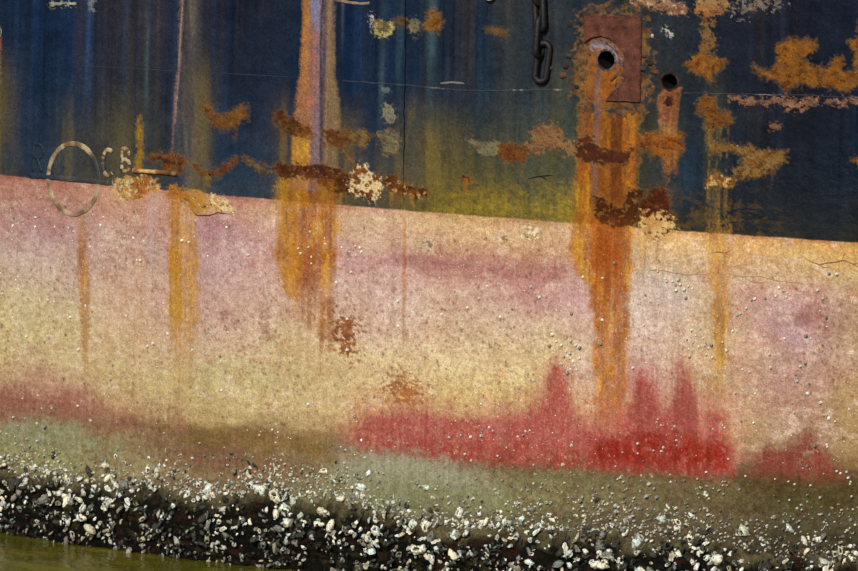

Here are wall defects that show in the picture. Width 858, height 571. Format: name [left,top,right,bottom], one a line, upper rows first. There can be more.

peeling [108,173,238,219]
corrosion [132,0,376,409]
peeling [342,159,386,207]
corrosion [563,0,689,403]
corrosion [681,48,791,393]
corrosion [748,18,858,104]